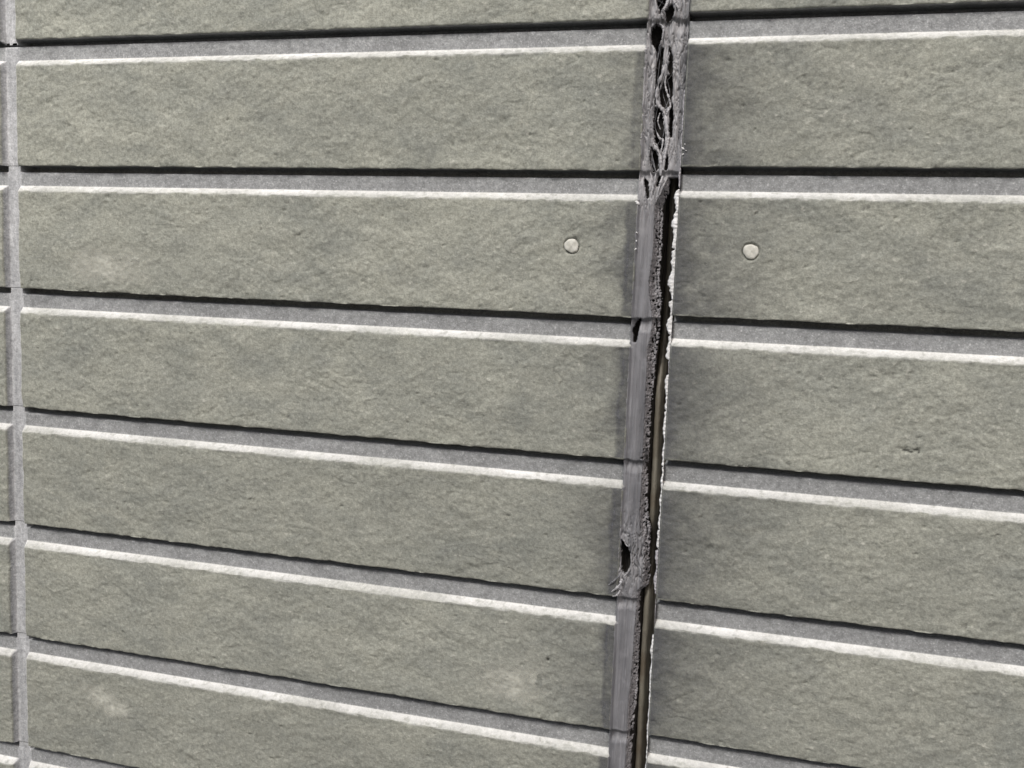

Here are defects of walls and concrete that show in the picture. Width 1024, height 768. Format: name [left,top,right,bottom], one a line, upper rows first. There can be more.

spalling [608,541,631,597]
crack [626,178,671,768]